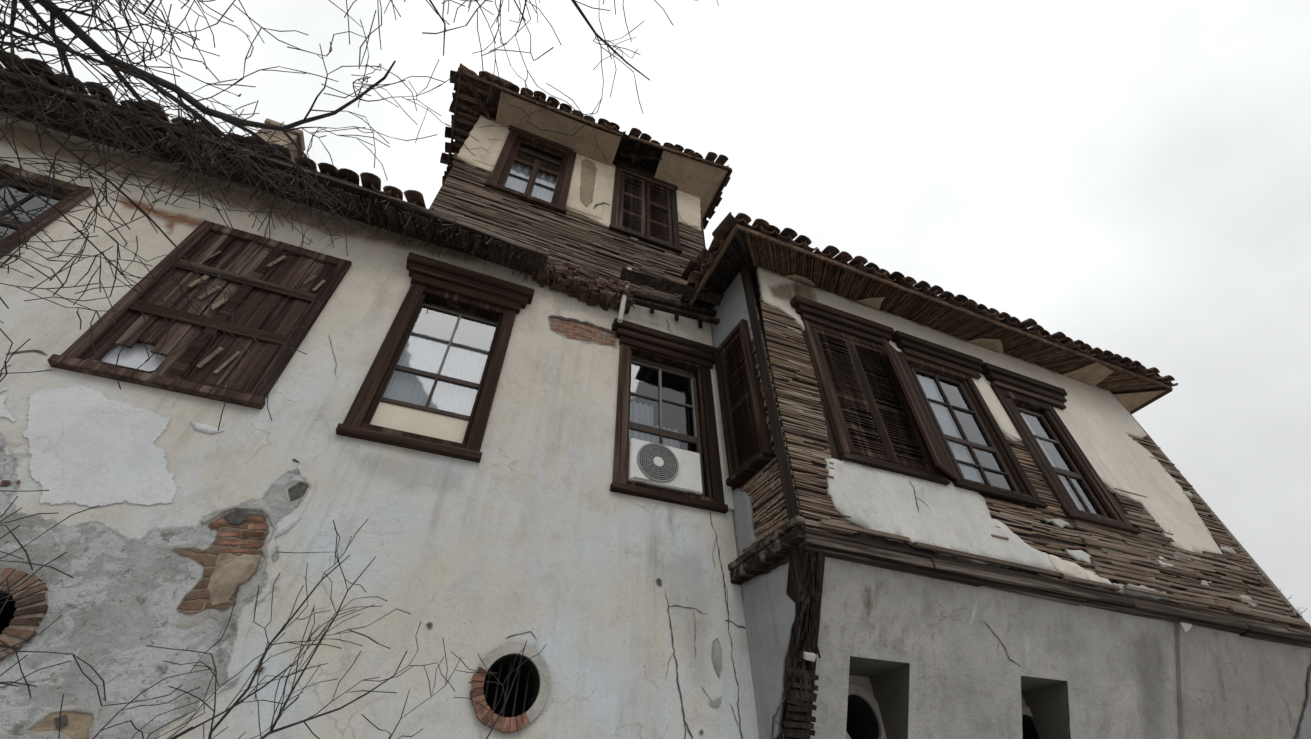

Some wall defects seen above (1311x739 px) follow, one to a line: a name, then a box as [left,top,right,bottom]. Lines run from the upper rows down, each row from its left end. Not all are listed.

flaking render [163,459,317,739]
crack [665,511,789,739]
crack [1295,667,1311,739]